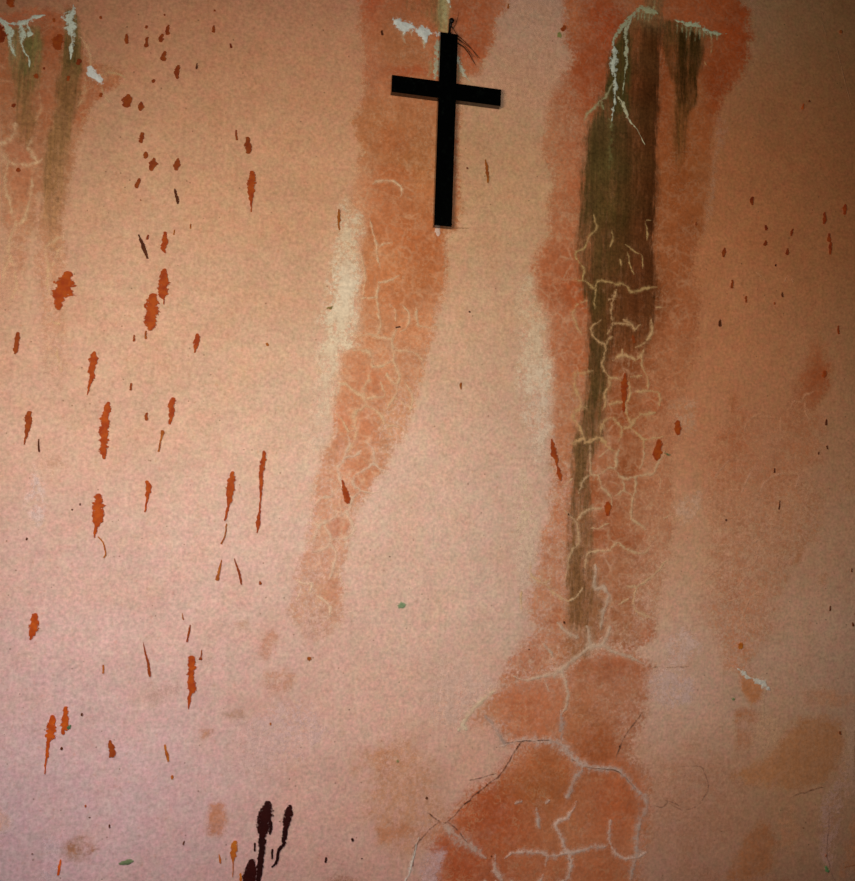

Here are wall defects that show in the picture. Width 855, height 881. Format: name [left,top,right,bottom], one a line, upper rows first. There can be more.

water stain [0,5,122,364]
water stain [289,0,753,881]
crack [405,217,680,881]
water stain [709,346,829,721]